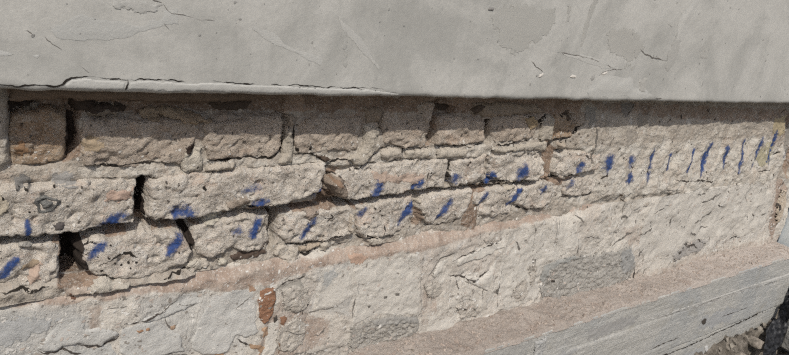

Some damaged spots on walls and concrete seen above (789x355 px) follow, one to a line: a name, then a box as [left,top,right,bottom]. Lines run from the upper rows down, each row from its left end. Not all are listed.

crack [0,67,184,104]
crack [273,84,395,93]
spalling [21,259,43,285]
crack [87,157,190,190]
spalling [322,172,348,198]
crack [284,214,400,256]
crack [207,117,527,190]
flaking render [27,183,772,355]
crack [420,240,520,317]
crack [515,124,608,253]
crack [612,165,724,279]
crack [655,277,789,355]